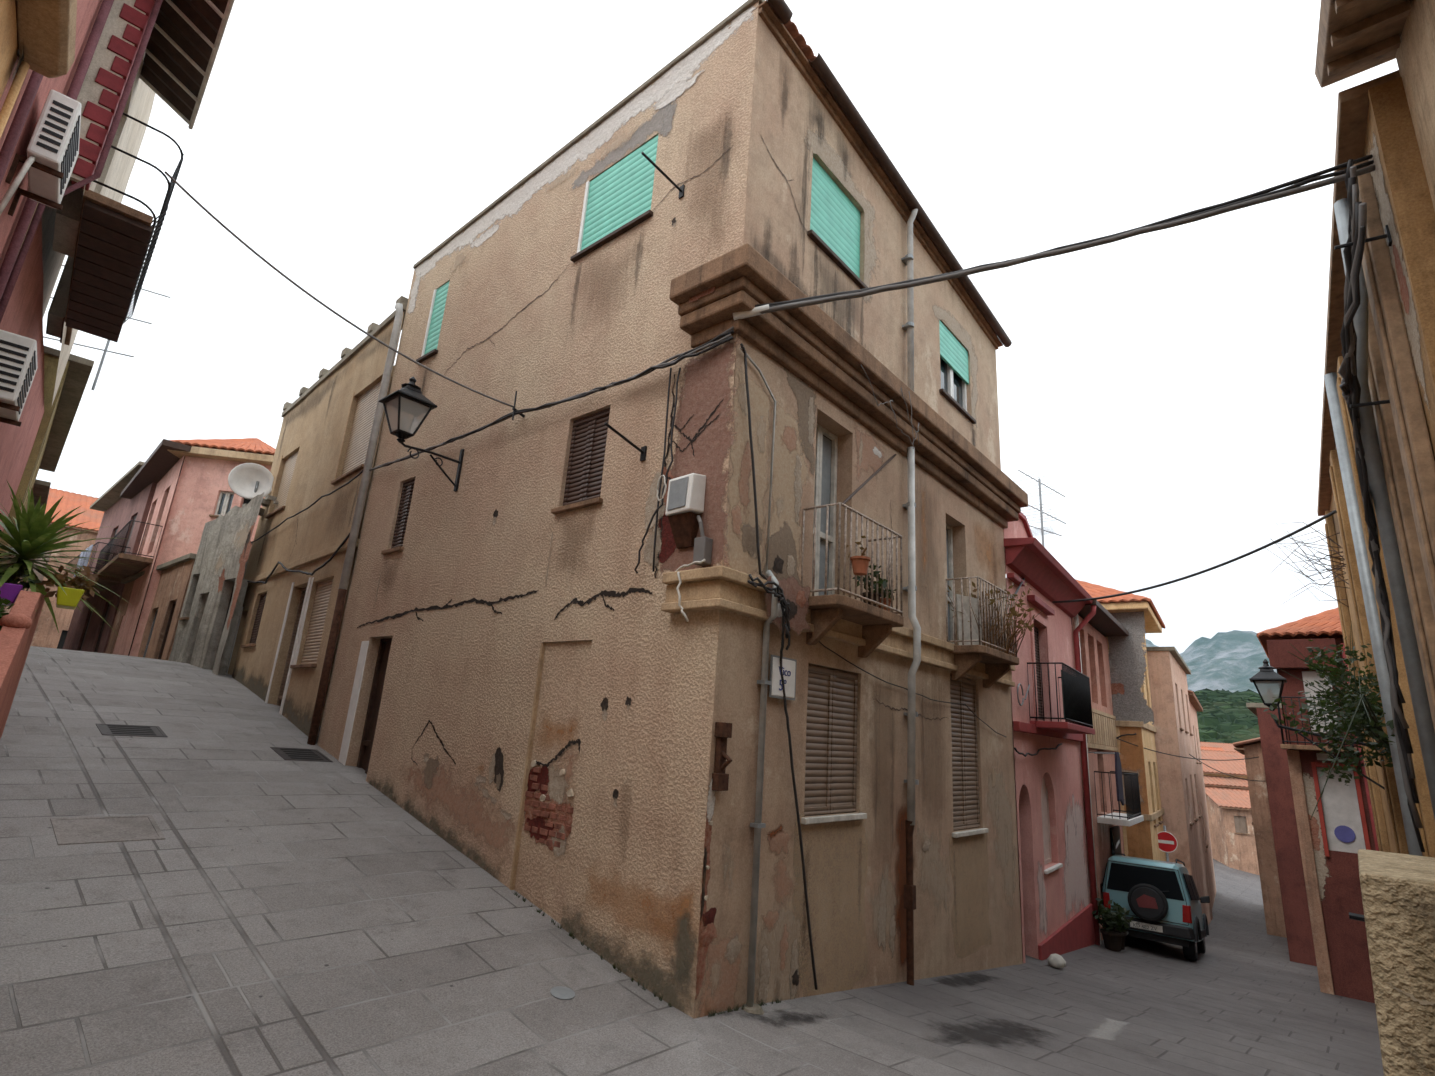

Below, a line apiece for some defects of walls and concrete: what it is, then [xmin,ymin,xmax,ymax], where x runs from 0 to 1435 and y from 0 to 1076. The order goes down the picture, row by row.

peeling [407,6,756,314]
crack [664,374,724,480]
crack [357,516,663,628]
crack [411,720,456,766]
spalling [524,739,581,856]
water stain [598,884,694,982]
spalling [695,781,717,1000]
rust [895,808,907,966]